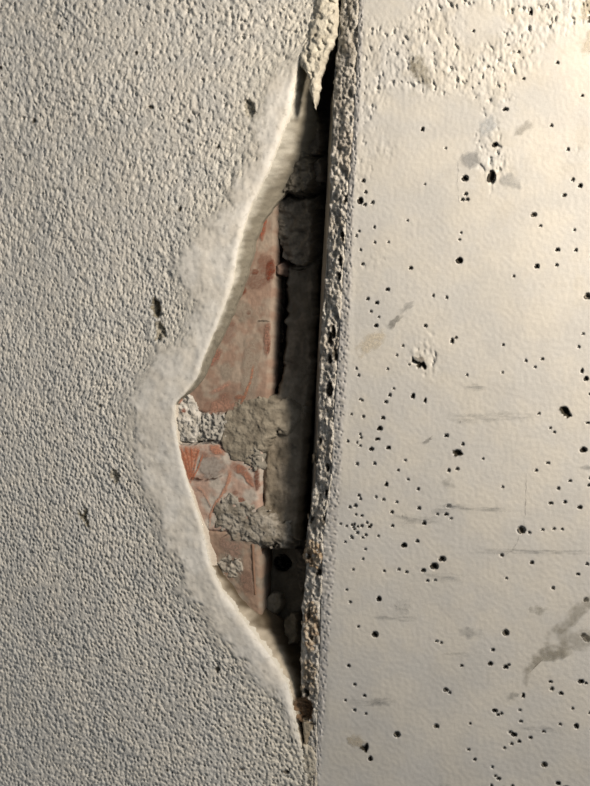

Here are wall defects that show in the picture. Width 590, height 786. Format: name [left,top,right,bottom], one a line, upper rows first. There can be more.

spalling [117,0,340,758]